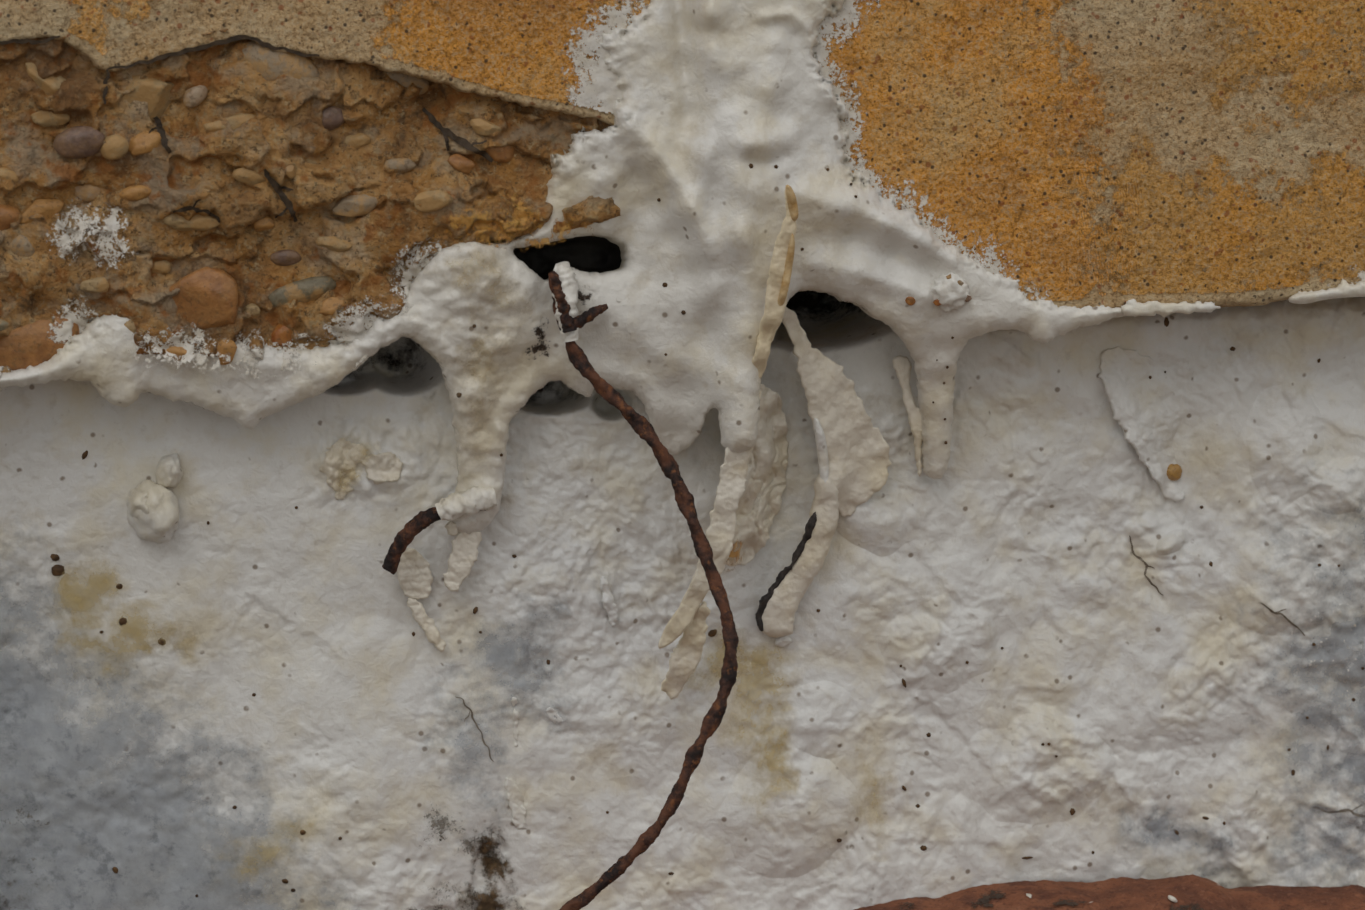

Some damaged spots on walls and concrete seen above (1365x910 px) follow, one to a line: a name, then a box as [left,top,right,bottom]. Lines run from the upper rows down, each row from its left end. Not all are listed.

spalling [0,29,621,374]
water stain [0,587,281,910]